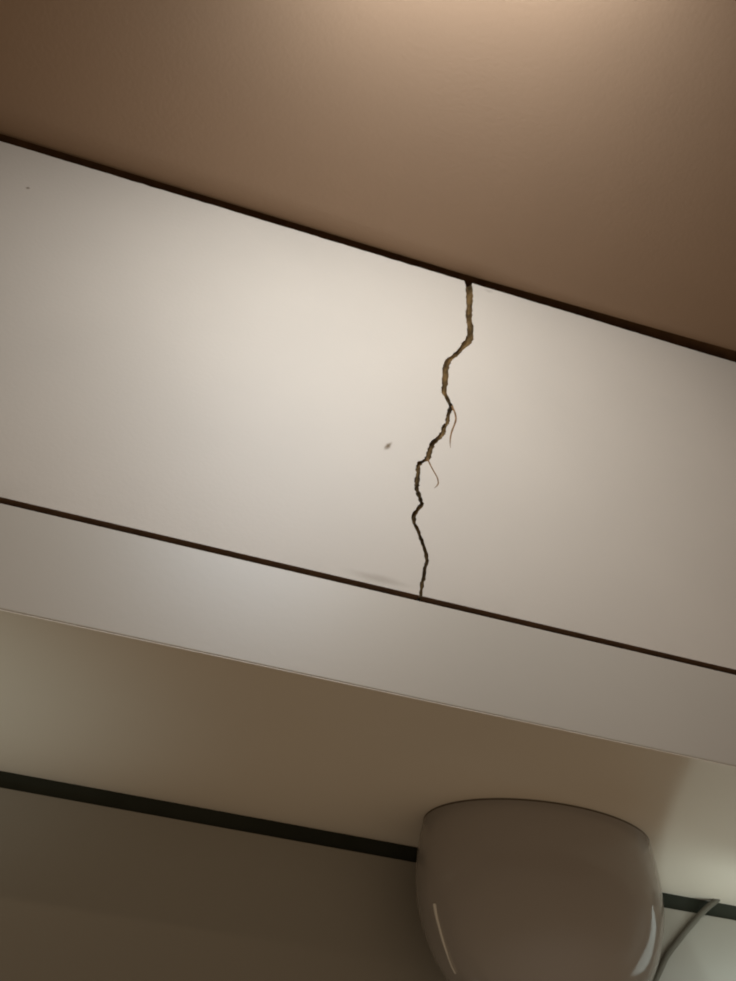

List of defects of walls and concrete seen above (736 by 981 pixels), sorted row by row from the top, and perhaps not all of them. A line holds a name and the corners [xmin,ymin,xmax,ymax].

crack [411,284,474,598]